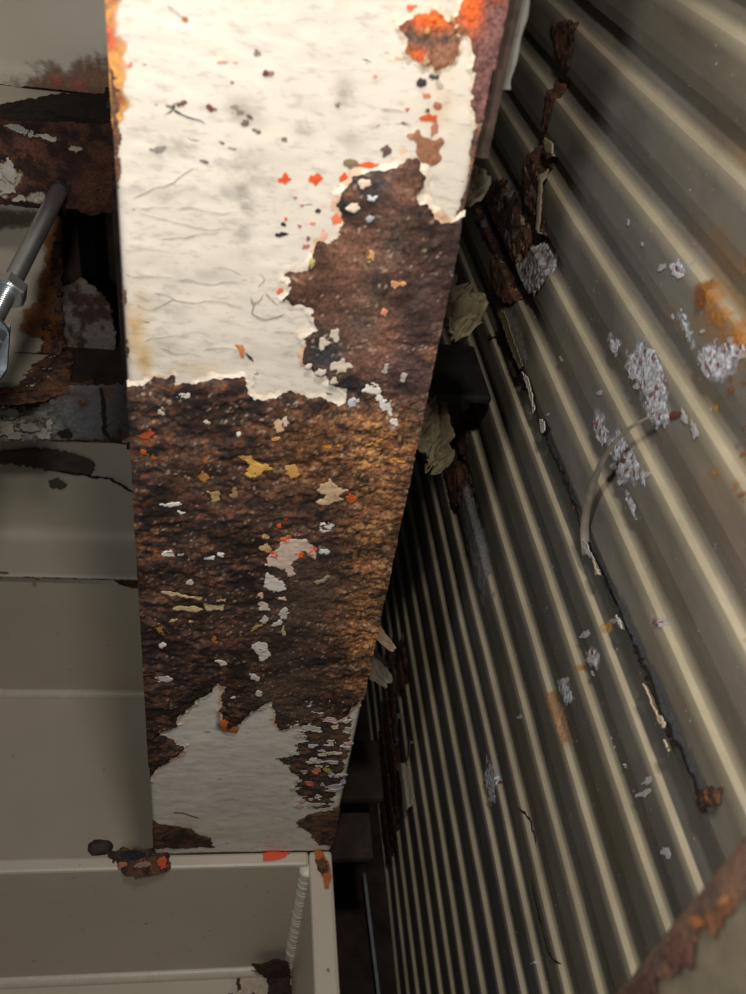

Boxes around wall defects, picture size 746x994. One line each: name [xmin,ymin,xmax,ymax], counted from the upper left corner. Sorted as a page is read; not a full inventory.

peeling [406,74,444,166]
peeling [337,144,392,187]
crack [131,168,234,240]
peeling [275,196,343,249]
crack [129,267,296,334]
crack [146,335,248,357]
rust [0,0,558,866]
peeling [276,700,354,812]
rust [88,820,214,879]
rust [296,806,340,889]
rust [616,838,746,994]
rust [251,959,292,994]